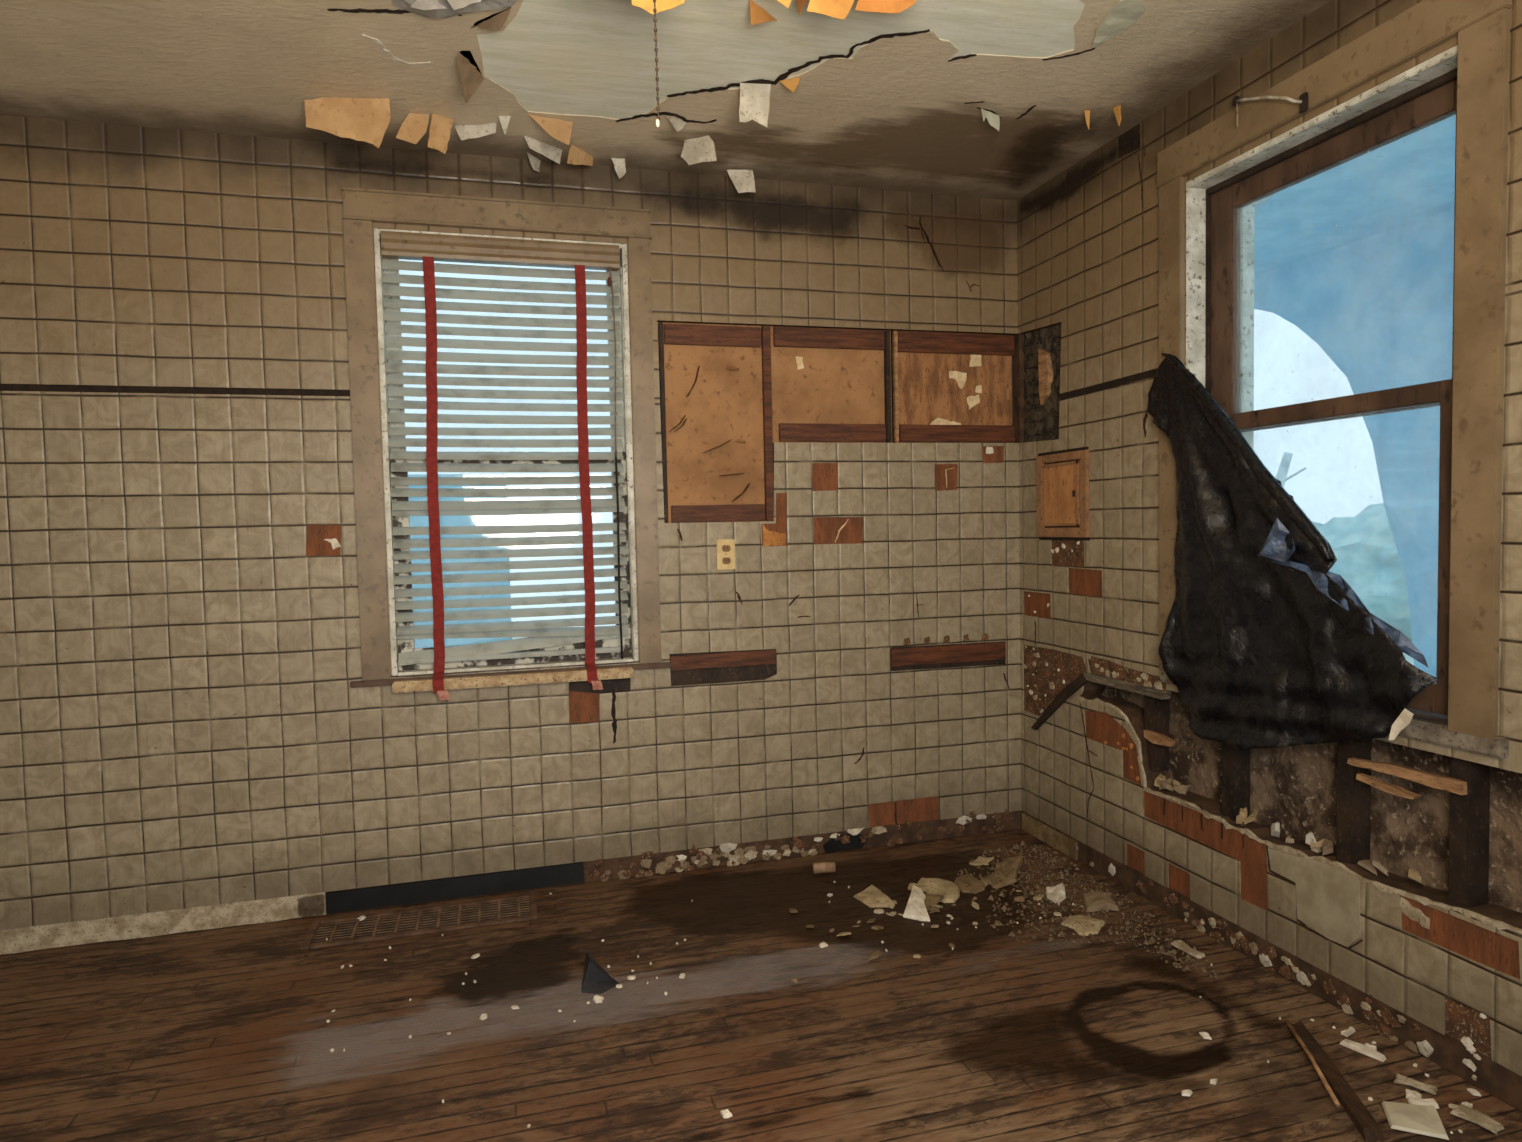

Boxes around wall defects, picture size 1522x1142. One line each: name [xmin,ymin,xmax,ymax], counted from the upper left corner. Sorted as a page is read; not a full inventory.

peeling [305,0,1085,193]
crack [616,29,976,124]
crack [964,101,1037,119]
crack [1042,48,1095,61]
peeling [812,463,838,491]
peeling [306,525,341,556]
peeling [813,517,863,544]
peeling [1051,540,1102,597]
peeling [669,649,777,686]
peeling [569,678,630,723]
peeling [890,633,1522,979]
peeling [584,796,1522,1111]